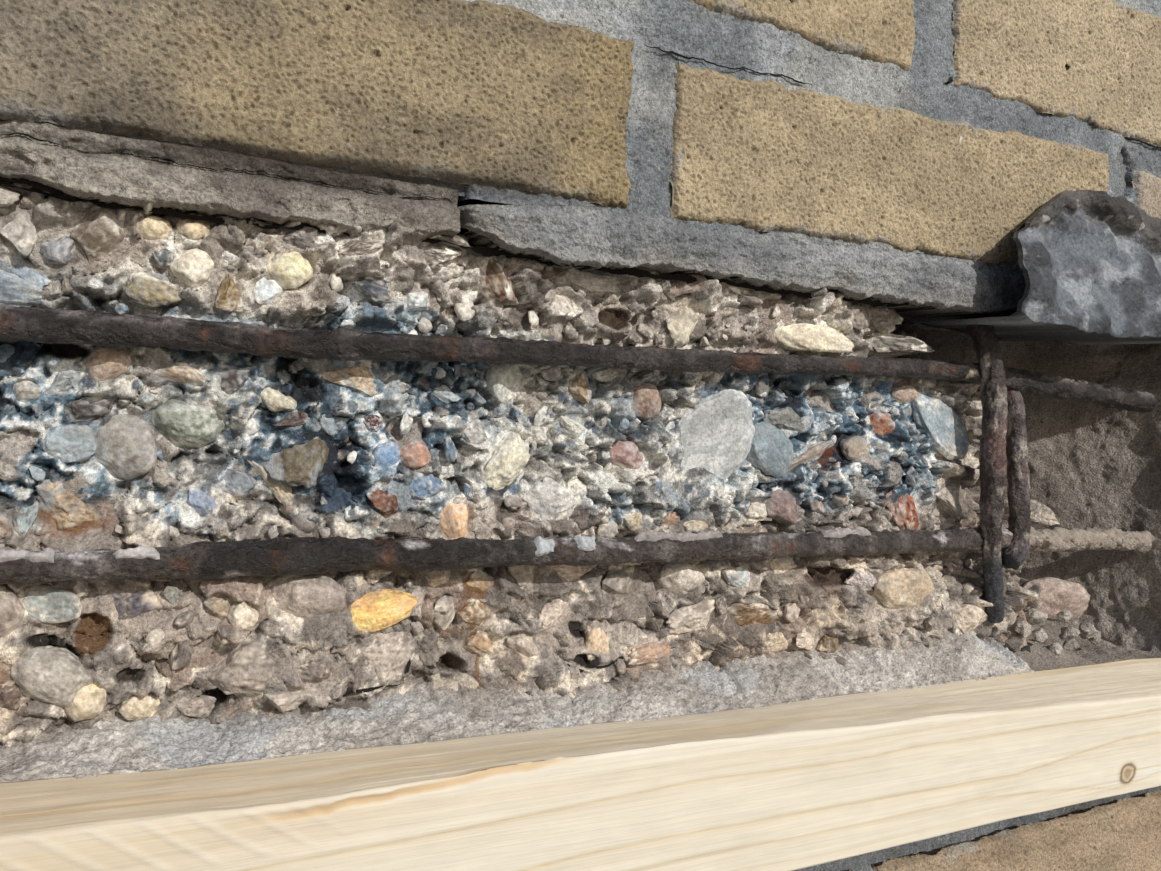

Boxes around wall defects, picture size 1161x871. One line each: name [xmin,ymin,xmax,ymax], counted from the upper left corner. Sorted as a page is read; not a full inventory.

crack [645,45,812,85]
crack [0,133,454,203]
crack [0,177,350,237]
crack [421,238,812,299]
crack [842,297,903,308]
spalling [1003,367,1157,413]
spalling [0,183,1090,747]
spalling [1028,499,1155,553]
corrosion [463,586,484,608]